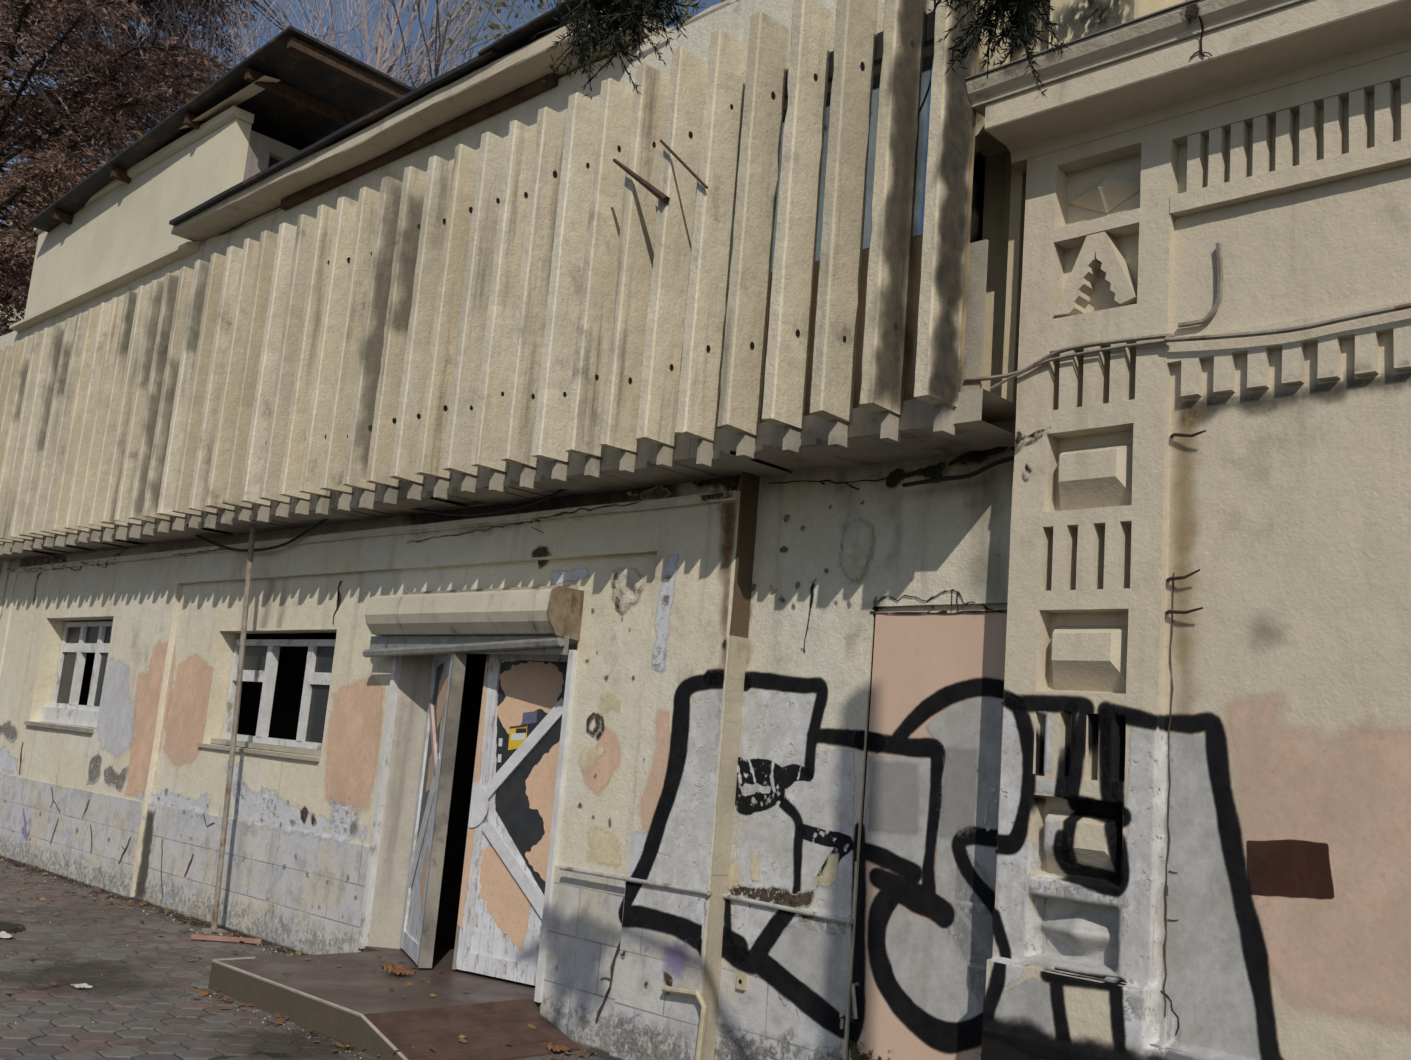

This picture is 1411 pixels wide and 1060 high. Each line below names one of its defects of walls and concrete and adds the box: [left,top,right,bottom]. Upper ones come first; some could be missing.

spalling [612,572,642,631]
peeling [652,554,678,672]
crack [801,579,816,652]
peeling [225,760,367,844]